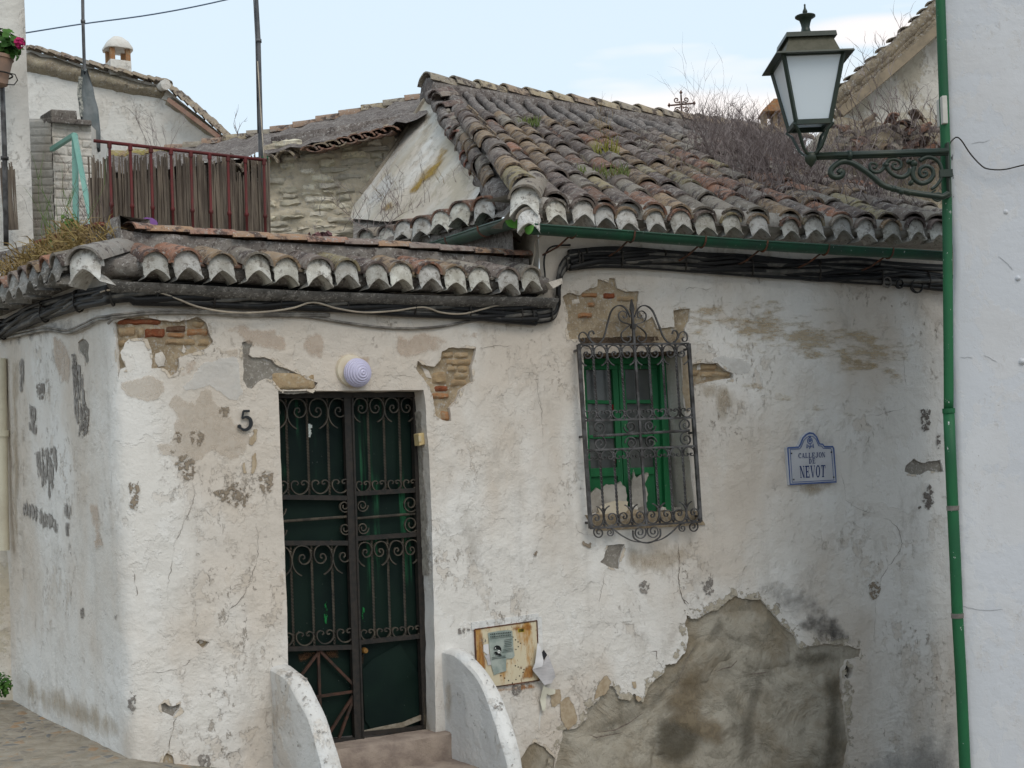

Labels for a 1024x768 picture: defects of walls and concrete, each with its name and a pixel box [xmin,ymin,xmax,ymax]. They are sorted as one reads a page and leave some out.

flaking render [71,339,89,388]
flaking render [113,315,214,378]
flaking render [239,340,317,394]
flaking render [562,277,734,412]
peeling [79,404,89,436]
peeling [213,429,273,508]
flaking render [414,345,476,576]
flaking render [905,409,942,510]
flaking render [601,544,626,570]
rust [521,666,533,690]
peeling [550,689,577,730]